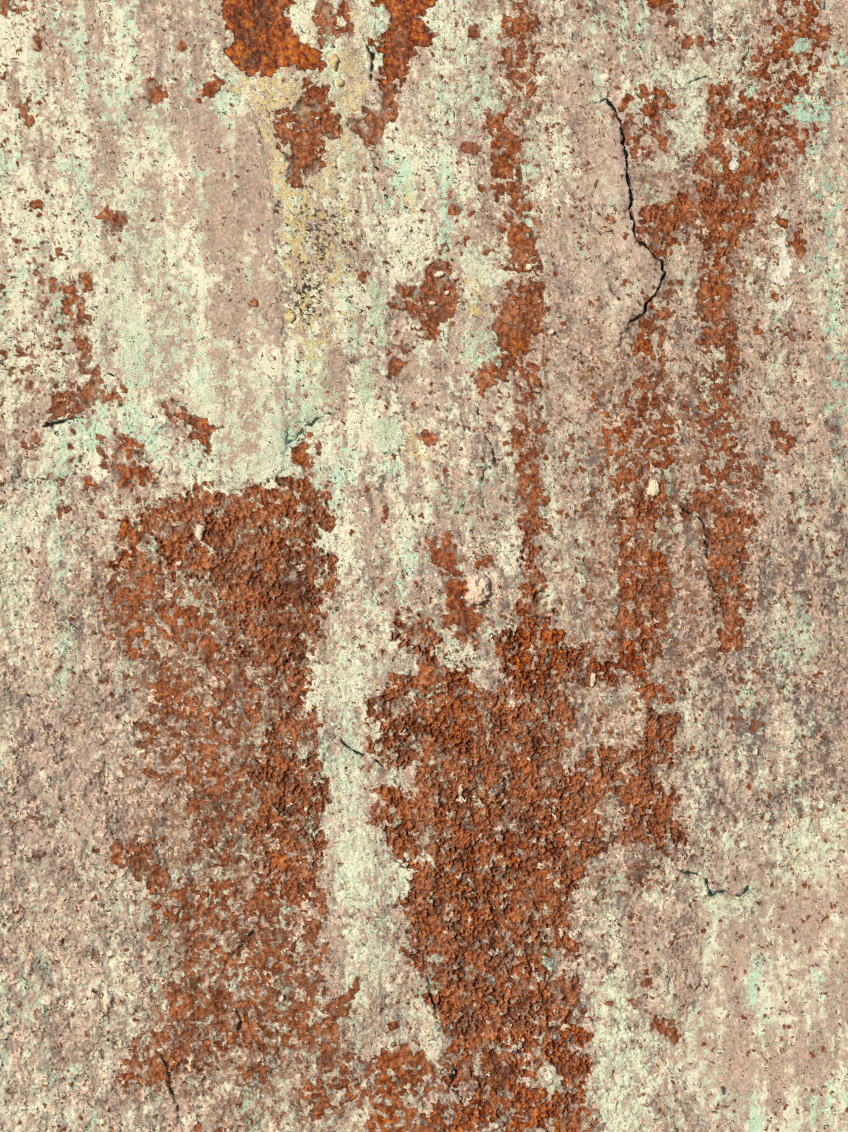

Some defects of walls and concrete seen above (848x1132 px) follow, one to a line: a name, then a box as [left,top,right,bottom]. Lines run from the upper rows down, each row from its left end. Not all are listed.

corrosion [28,199,42,209]
crack [589,98,666,322]
corrosion [4,257,128,420]
corrosion [630,0,840,655]
corrosion [14,433,42,450]
corrosion [57,475,72,519]
corrosion [84,0,687,1132]